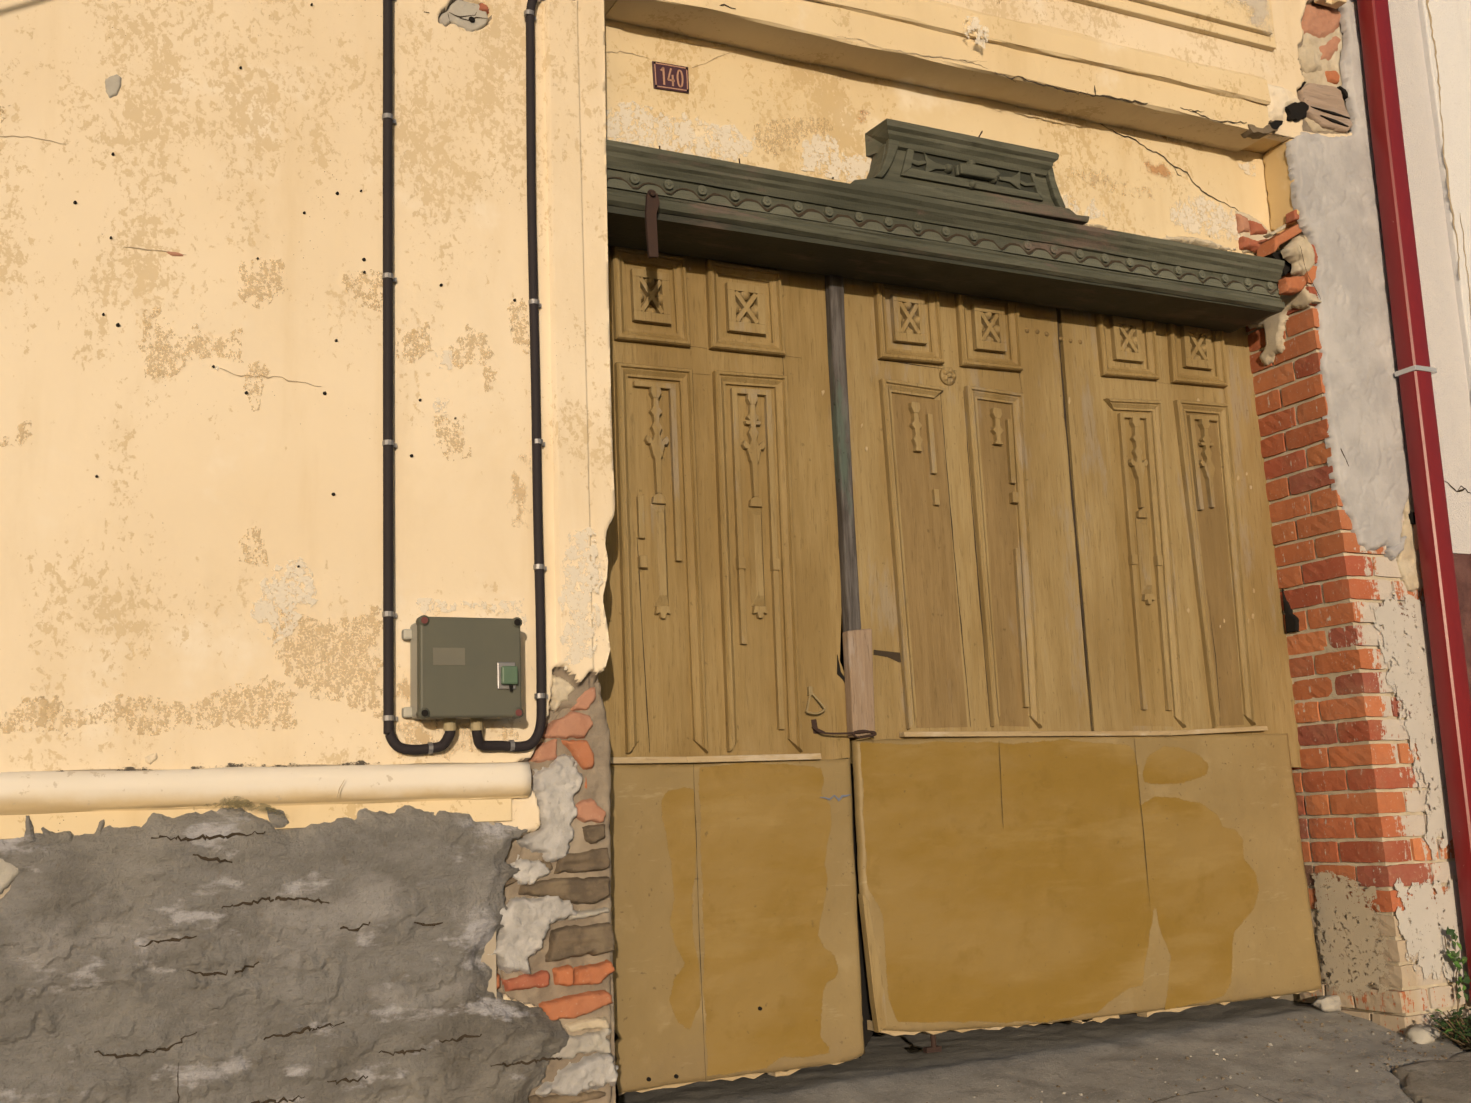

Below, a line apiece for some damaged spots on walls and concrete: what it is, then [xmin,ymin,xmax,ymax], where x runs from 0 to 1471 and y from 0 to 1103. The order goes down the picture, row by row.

flaking render [424,0,489,32]
crack [837,36,1247,211]
flaking render [1241,4,1352,139]
peeling [250,557,318,649]
peeling [1383,485,1423,592]
spalling [488,675,618,1103]